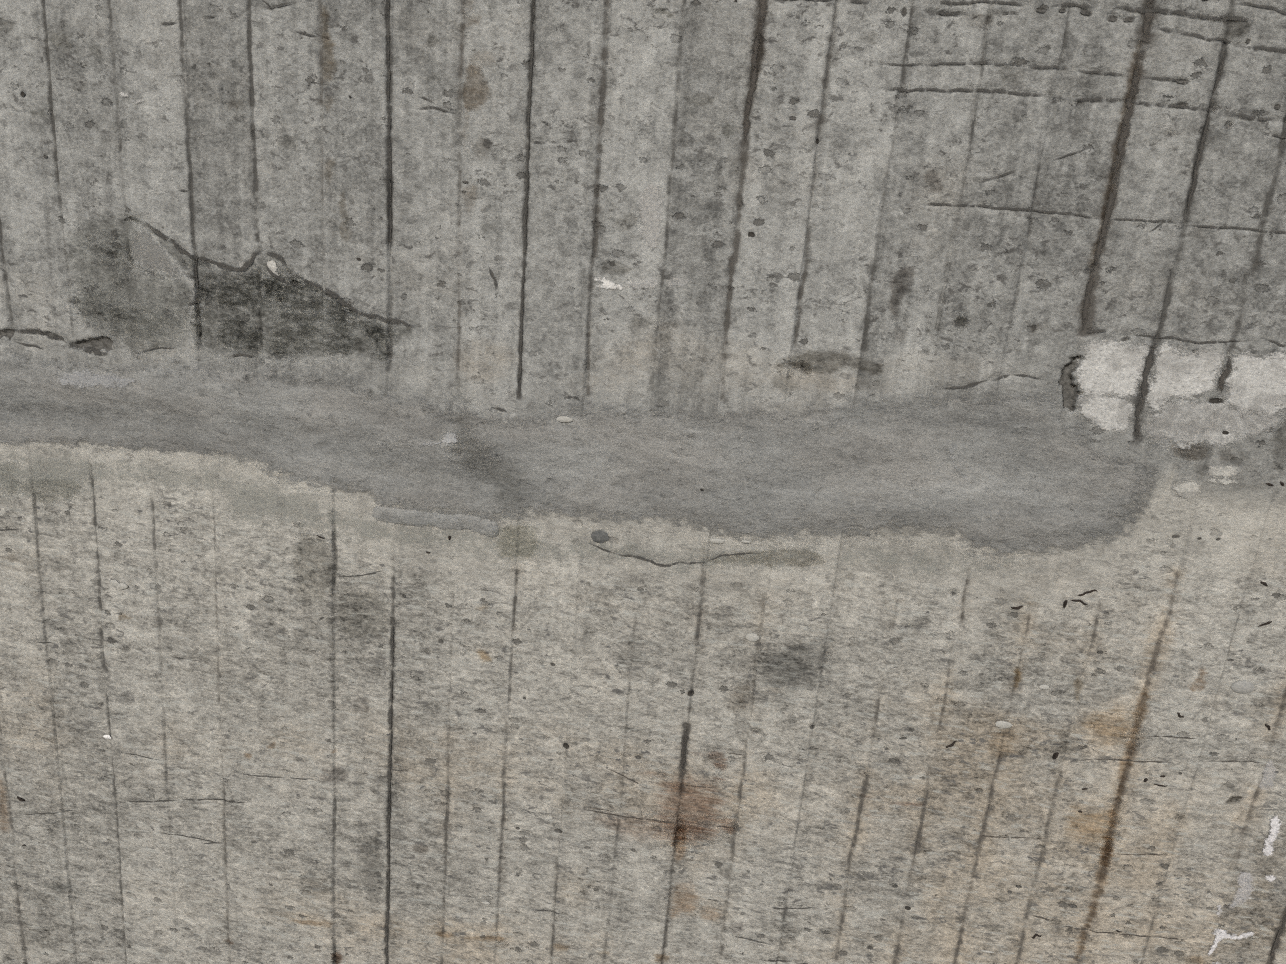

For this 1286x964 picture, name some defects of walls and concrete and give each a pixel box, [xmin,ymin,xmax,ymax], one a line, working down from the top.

water stain [148,225,412,327]
crack [14,329,172,355]
peeling [1076,340,1286,449]
efflorescence [1263,816,1282,856]
efflorescence [1208,905,1254,964]